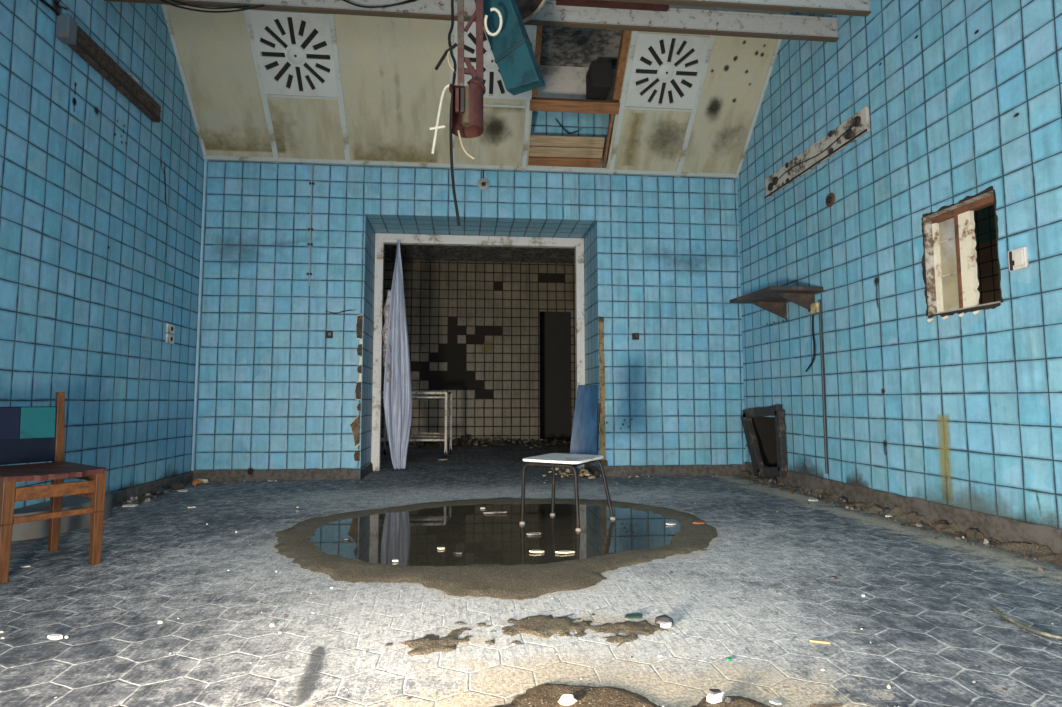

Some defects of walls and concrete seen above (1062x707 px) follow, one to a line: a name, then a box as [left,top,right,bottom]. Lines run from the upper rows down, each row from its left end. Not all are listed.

water stain [708,100,720,115]
water stain [483,118,504,141]
spalling [921,186,1004,322]